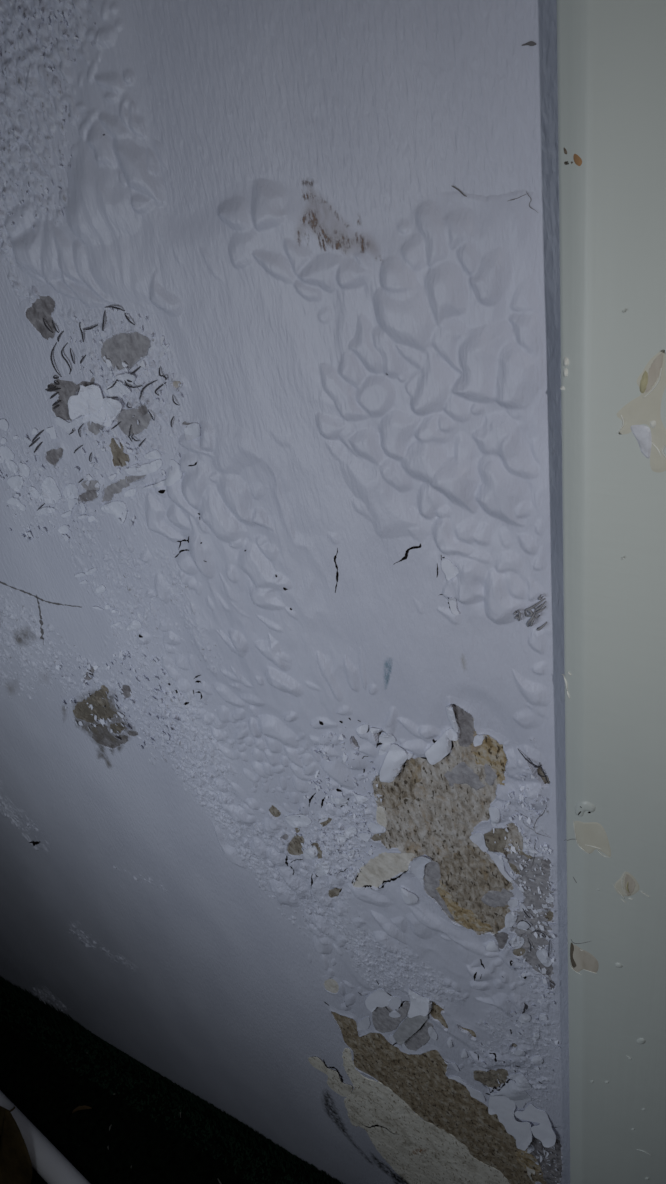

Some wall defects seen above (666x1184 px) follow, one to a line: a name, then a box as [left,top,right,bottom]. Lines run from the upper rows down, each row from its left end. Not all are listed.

peeling [0,284,201,534]
peeling [617,349,666,473]
spalling [72,661,141,754]
spalling [264,703,599,994]
spalling [308,989,570,1184]